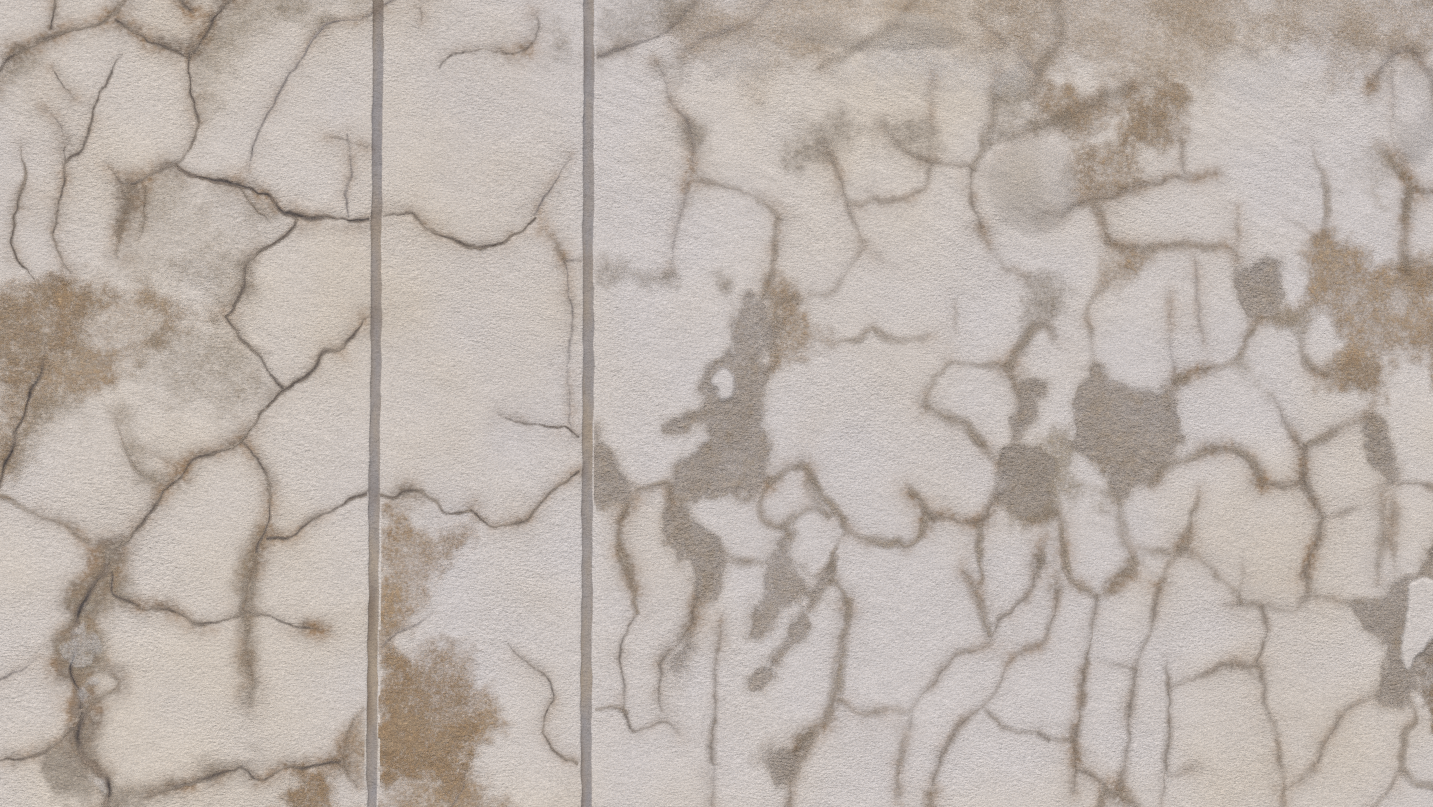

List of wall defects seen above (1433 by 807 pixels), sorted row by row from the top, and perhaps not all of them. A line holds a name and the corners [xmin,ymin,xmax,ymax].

water stain [1040,0,1224,192]
water stain [0,277,180,474]
crack [0,0,580,807]
peeling [663,293,778,599]
peeling [997,380,1055,518]
peeling [1073,365,1185,498]
water stain [1274,230,1433,390]
water stain [378,649,498,807]
crack [595,480,671,732]
crack [761,464,1198,807]
crack [1158,431,1346,699]
water stain [1421,639,1433,727]